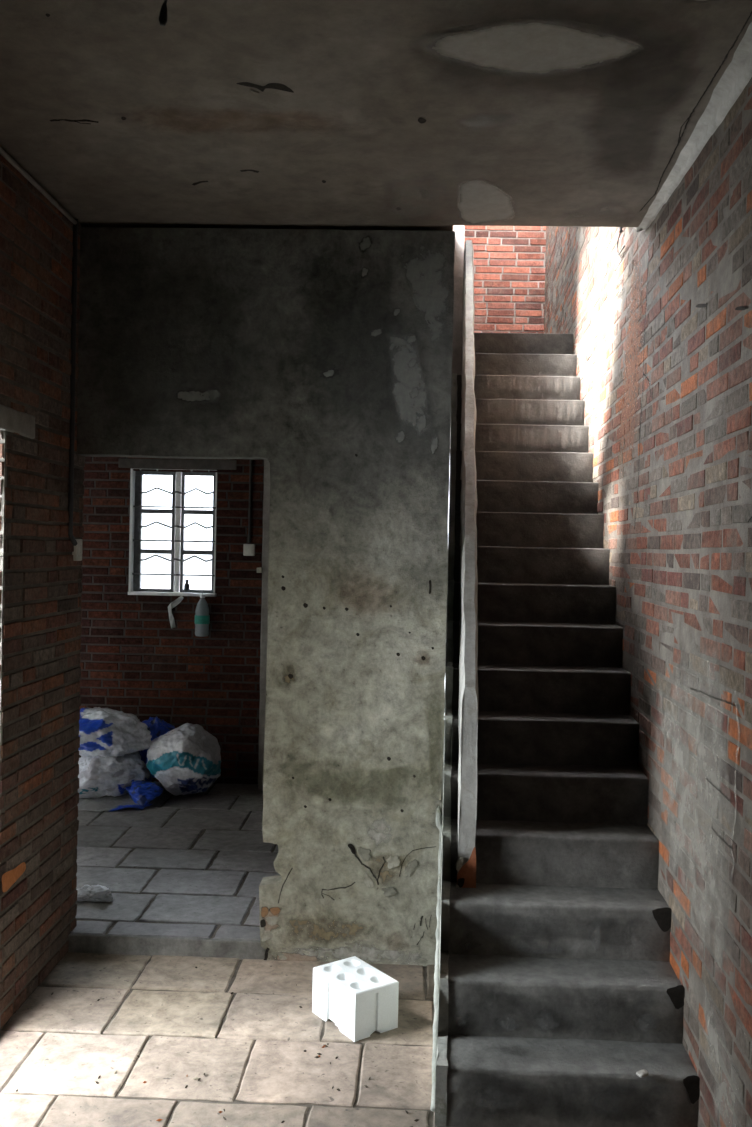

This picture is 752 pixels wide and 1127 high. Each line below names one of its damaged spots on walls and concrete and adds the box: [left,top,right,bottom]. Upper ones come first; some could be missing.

crack [321,882,356,900]
flaking render [260,907,281,942]